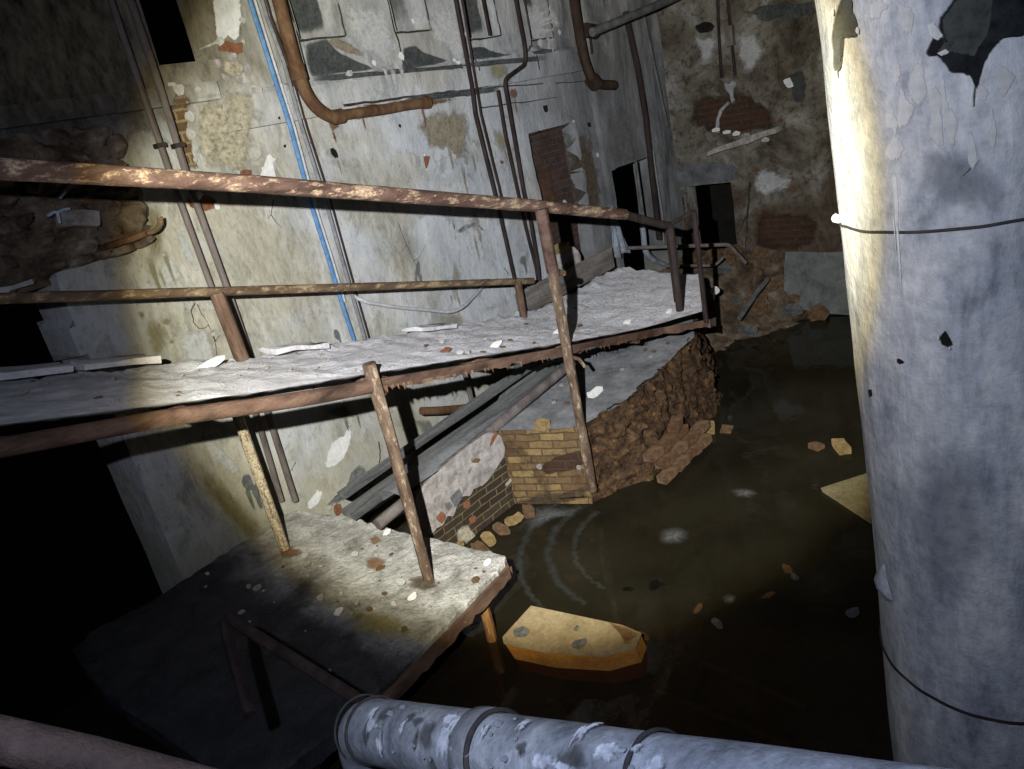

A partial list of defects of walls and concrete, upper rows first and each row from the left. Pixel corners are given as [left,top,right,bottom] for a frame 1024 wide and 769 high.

peeling [199,0,246,57]
spalling [0,125,128,166]
spalling [0,180,199,292]
flaking render [168,82,276,177]
flaking render [537,138,600,232]
spalling [692,90,783,134]
spalling [756,210,817,254]
flaking render [415,432,505,538]